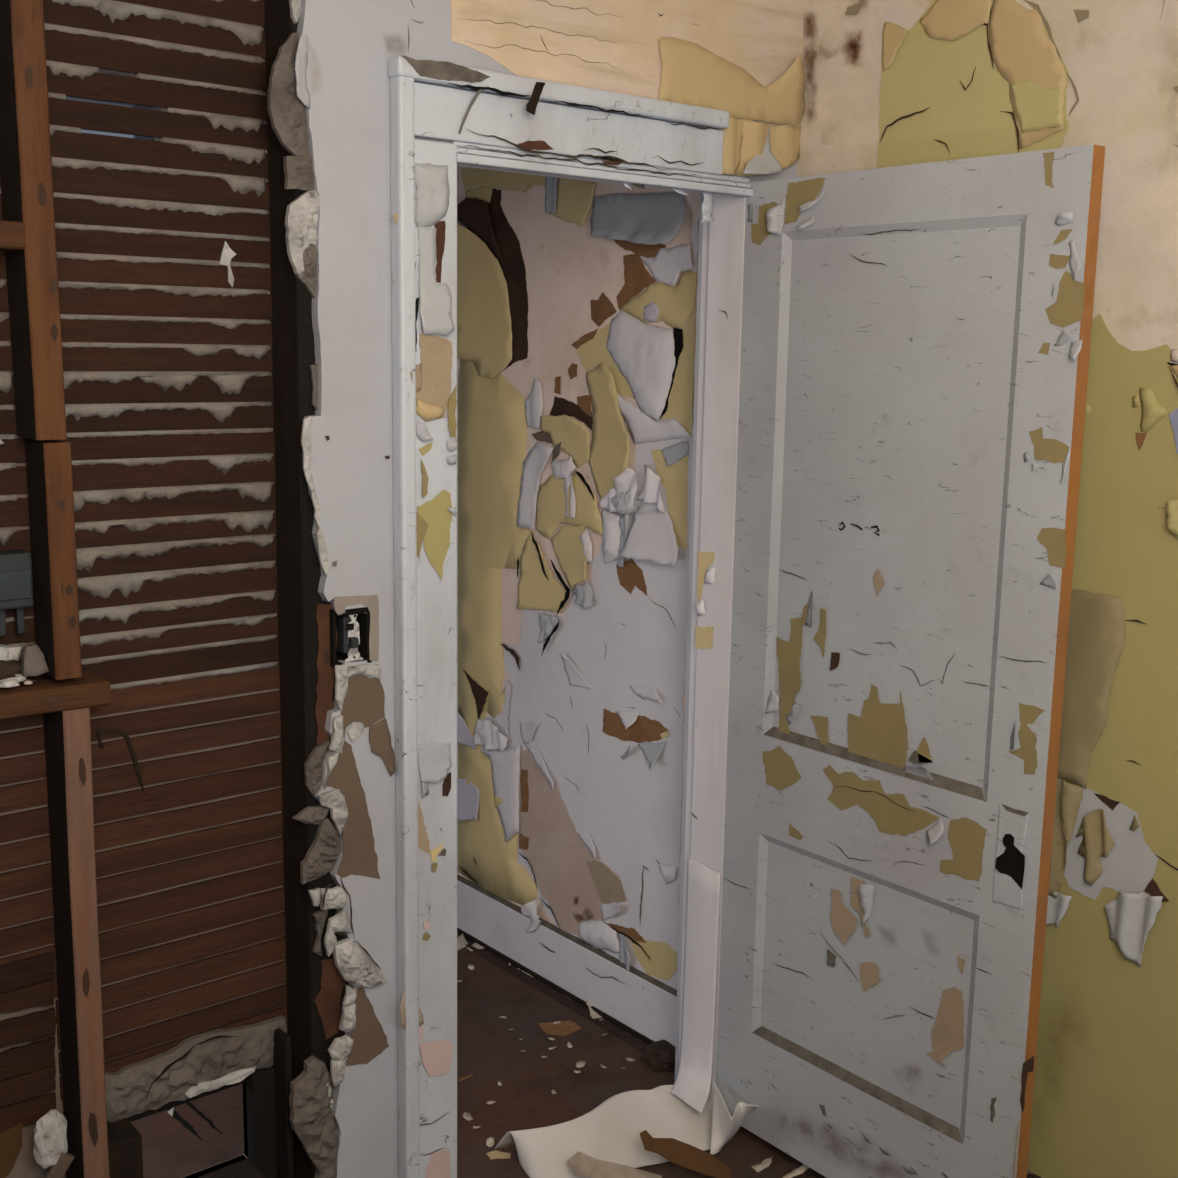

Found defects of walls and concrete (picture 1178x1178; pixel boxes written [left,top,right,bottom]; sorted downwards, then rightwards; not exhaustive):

spalling [267,0,320,298]
crack [408,0,425,51]
crack [461,0,623,70]
crack [458,129,703,177]
crack [448,83,718,130]
flaking render [451,0,805,99]
peeling [467,189,528,369]
peeling [572,239,666,349]
peeling [410,163,458,580]
peeling [822,765,986,882]
peeling [1046,589,1169,967]
spalling [289,595,396,1178]